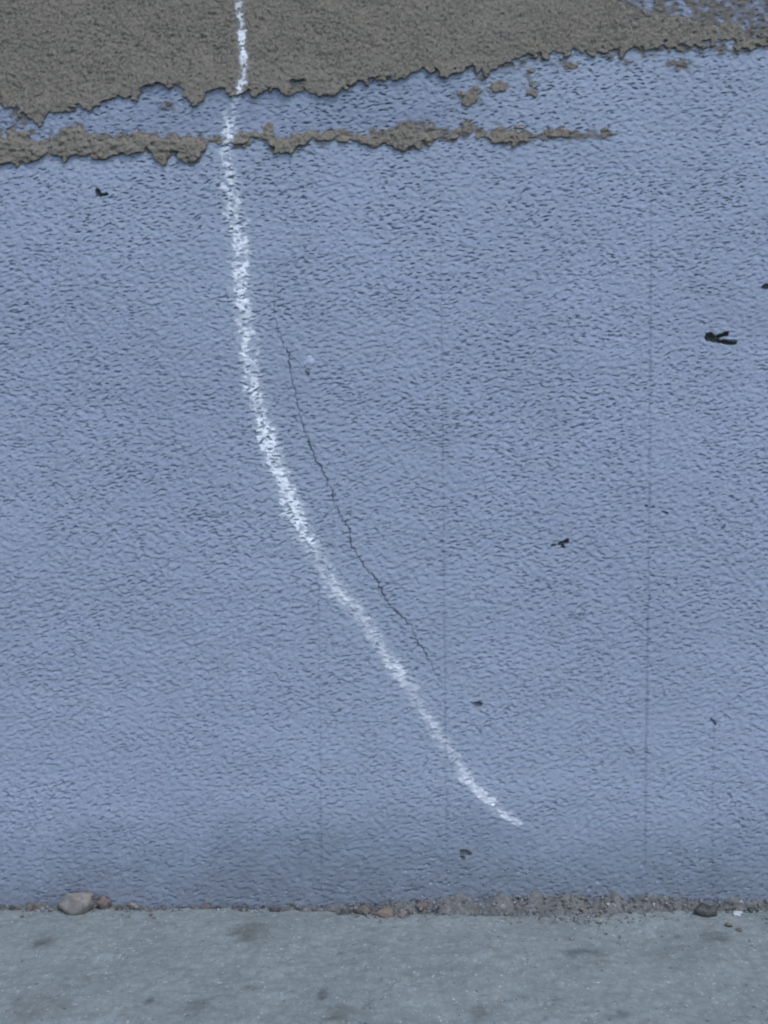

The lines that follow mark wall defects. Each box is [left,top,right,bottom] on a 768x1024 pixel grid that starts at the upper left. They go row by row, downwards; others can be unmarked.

peeling [0,0,768,168]
crack [283,346,433,668]